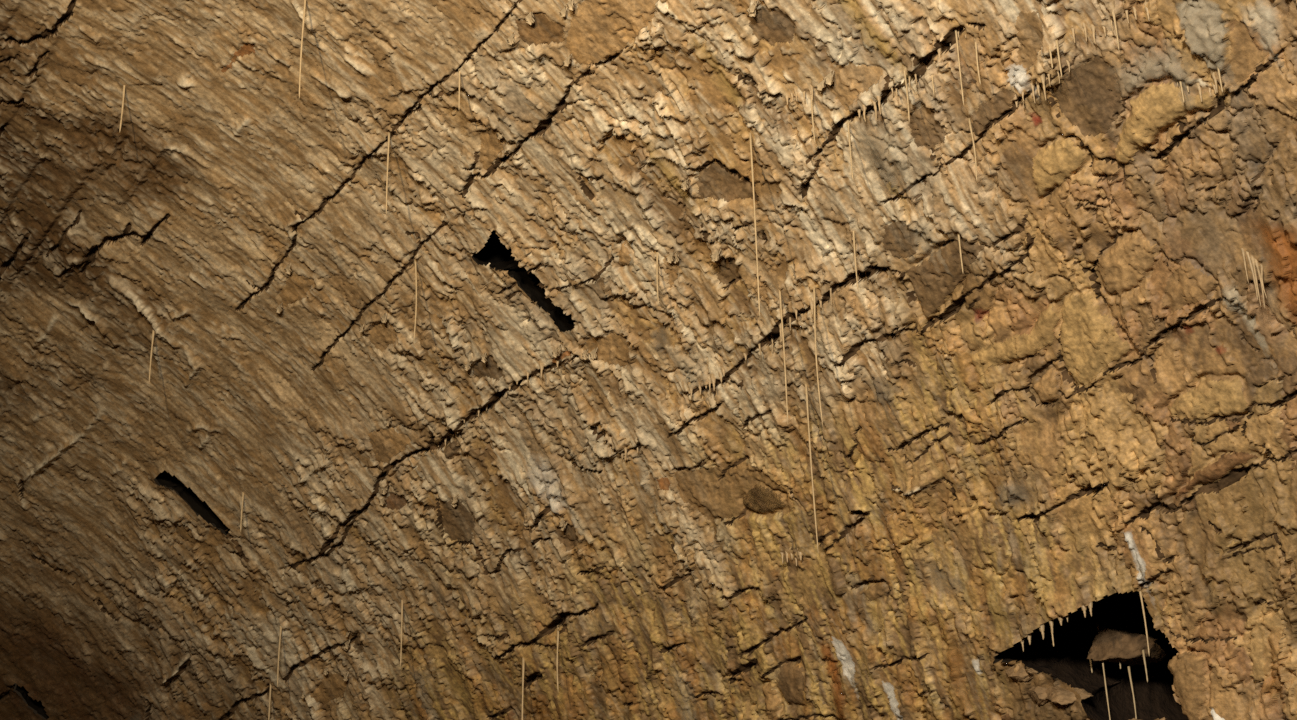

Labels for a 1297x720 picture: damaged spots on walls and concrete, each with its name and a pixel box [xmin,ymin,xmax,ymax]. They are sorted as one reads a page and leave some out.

crack [0,0,77,136]
crack [235,0,522,311]
crack [311,46,628,371]
spalling [472,230,631,368]
spalling [156,470,230,534]
crack [288,355,579,575]
spalling [995,590,1208,720]